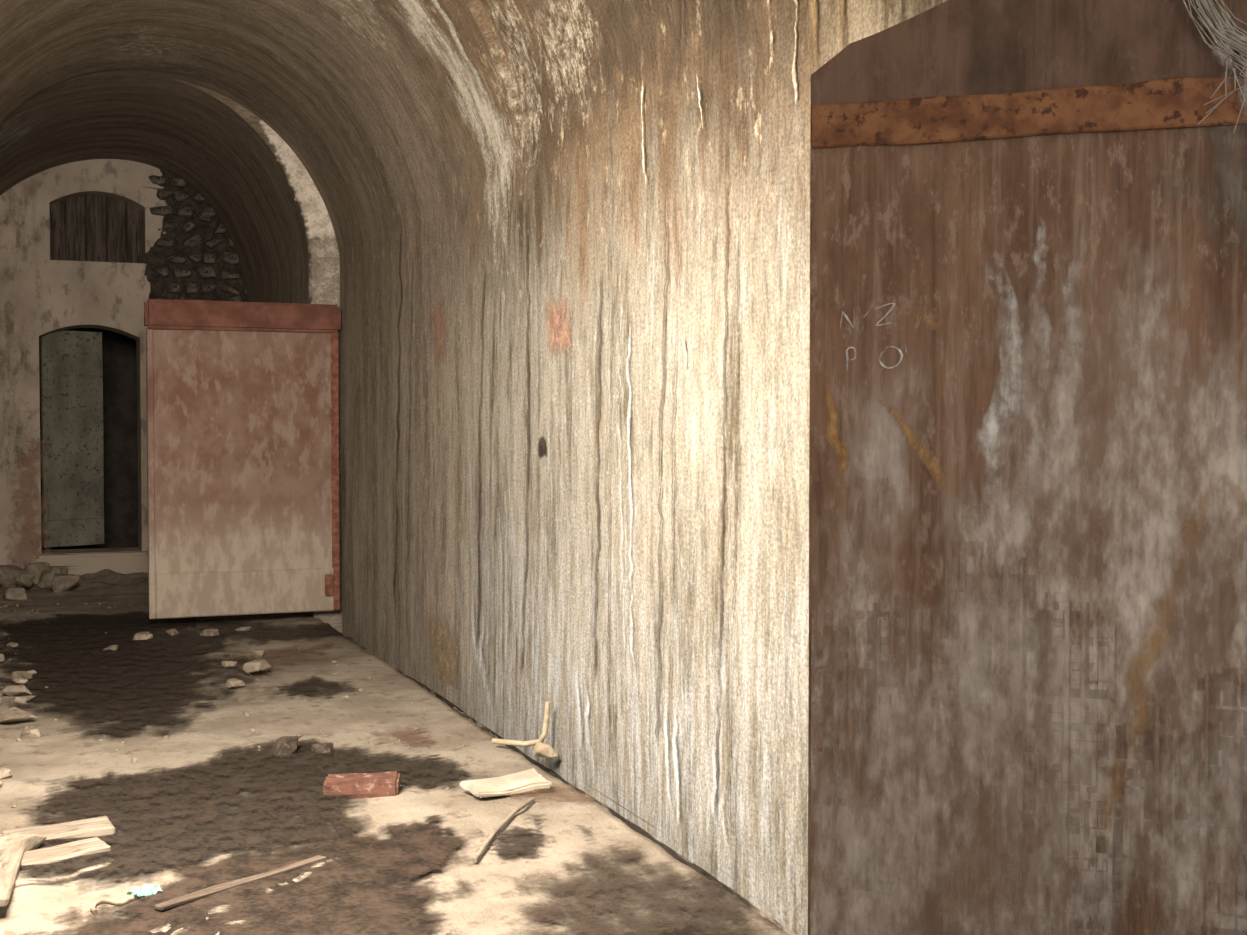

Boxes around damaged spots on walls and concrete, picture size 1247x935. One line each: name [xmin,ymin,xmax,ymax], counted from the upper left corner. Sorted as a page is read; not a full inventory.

water stain [431,0,470,65]
water stain [614,0,739,79]
water stain [792,0,817,100]
water stain [0,611,361,736]
water stain [15,739,546,935]
water stain [396,669,783,935]